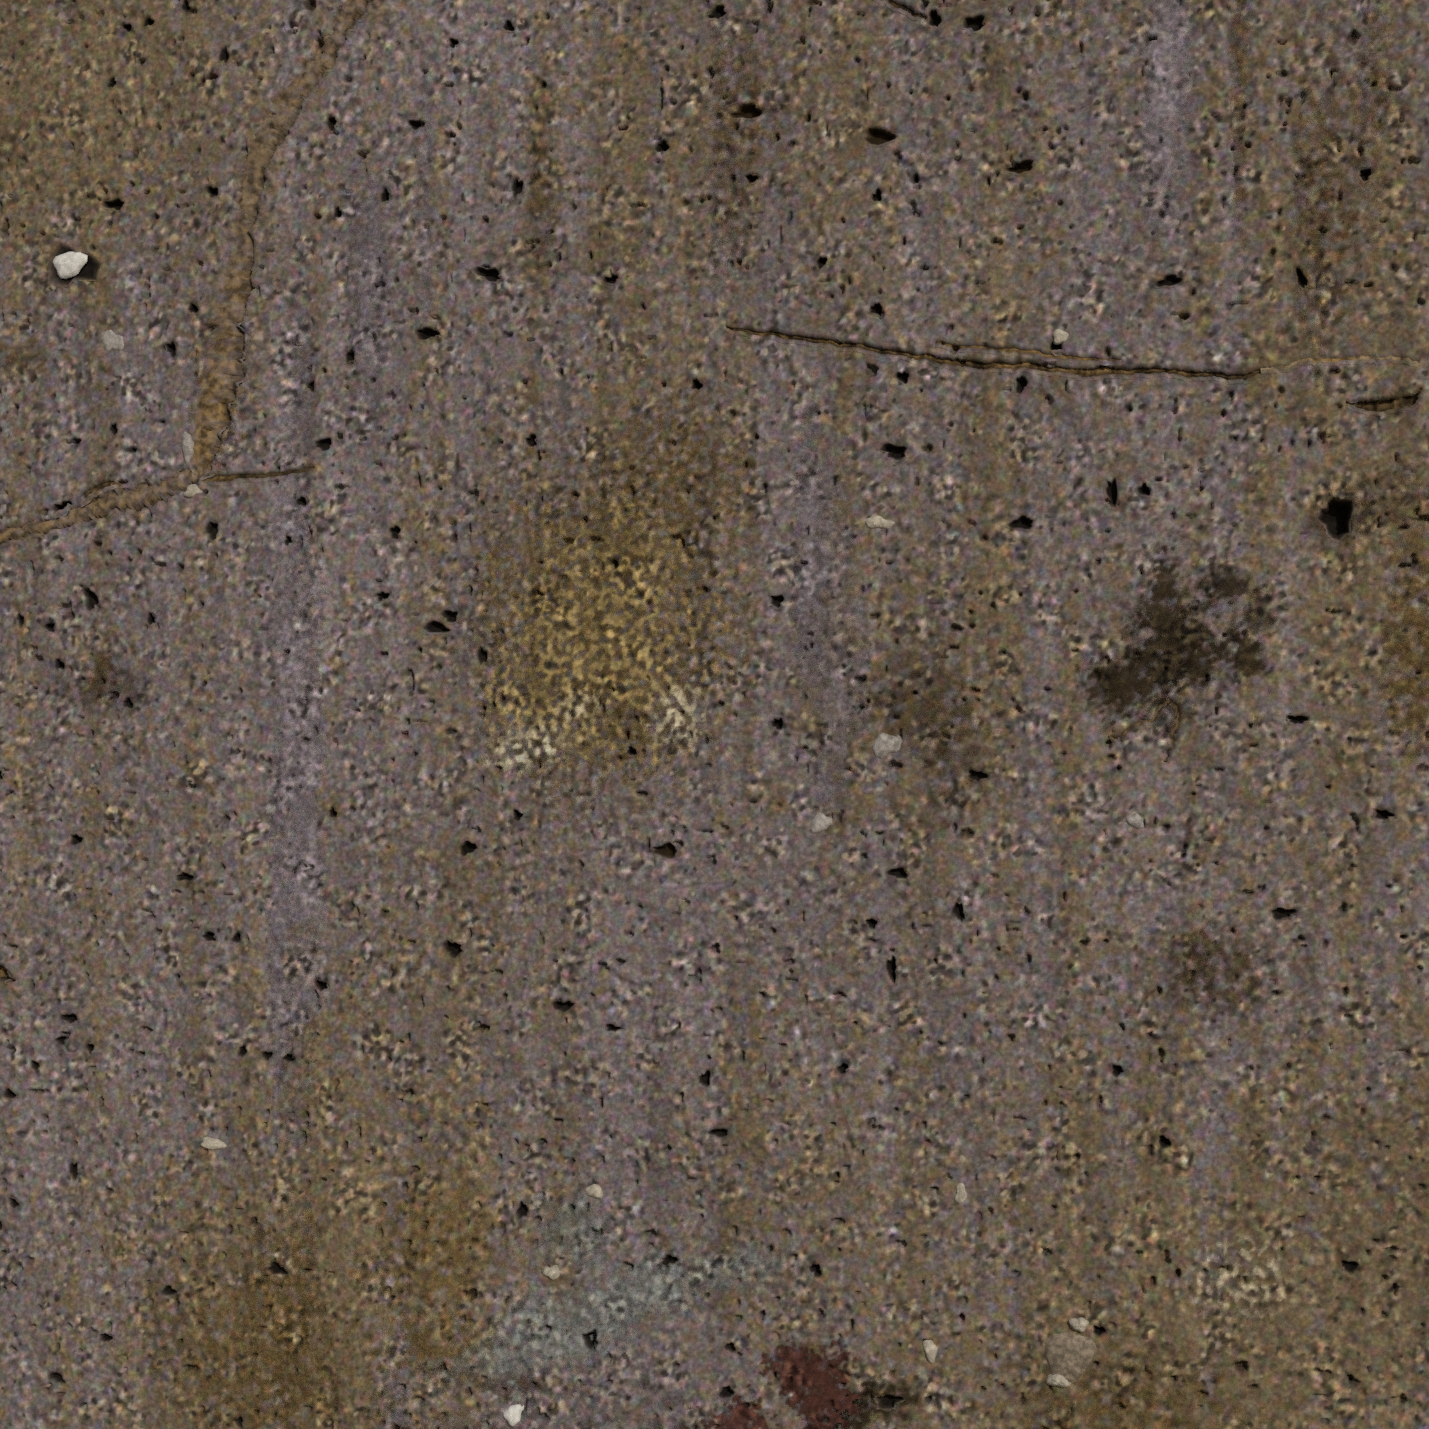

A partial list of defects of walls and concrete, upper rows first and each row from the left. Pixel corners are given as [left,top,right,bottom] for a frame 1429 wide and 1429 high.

crack [874,0,927,22]
crack [0,0,380,549]
crack [726,322,1425,416]
damp [1073,539,1273,736]
corrosion [678,1339,865,1429]